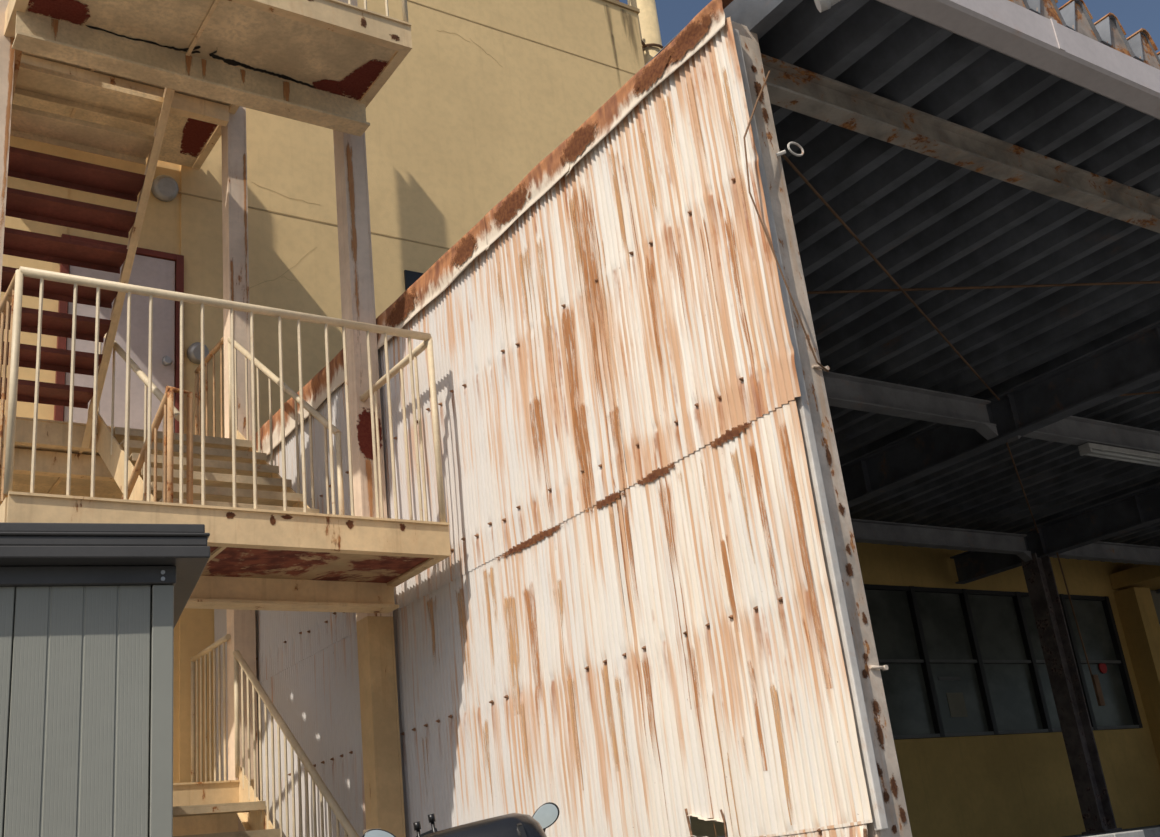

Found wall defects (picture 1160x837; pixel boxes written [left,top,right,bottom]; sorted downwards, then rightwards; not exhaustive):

crack [86,25,316,88]
rust [312,59,388,101]
rust [633,9,718,97]
rust [180,118,217,158]
rust [560,121,597,166]
rust [494,183,531,229]
rust [385,287,419,328]
rust [357,407,383,517]
rust [519,189,741,837]
rust [710,422,781,616]
rust [780,427,831,689]
rust [483,522,567,777]